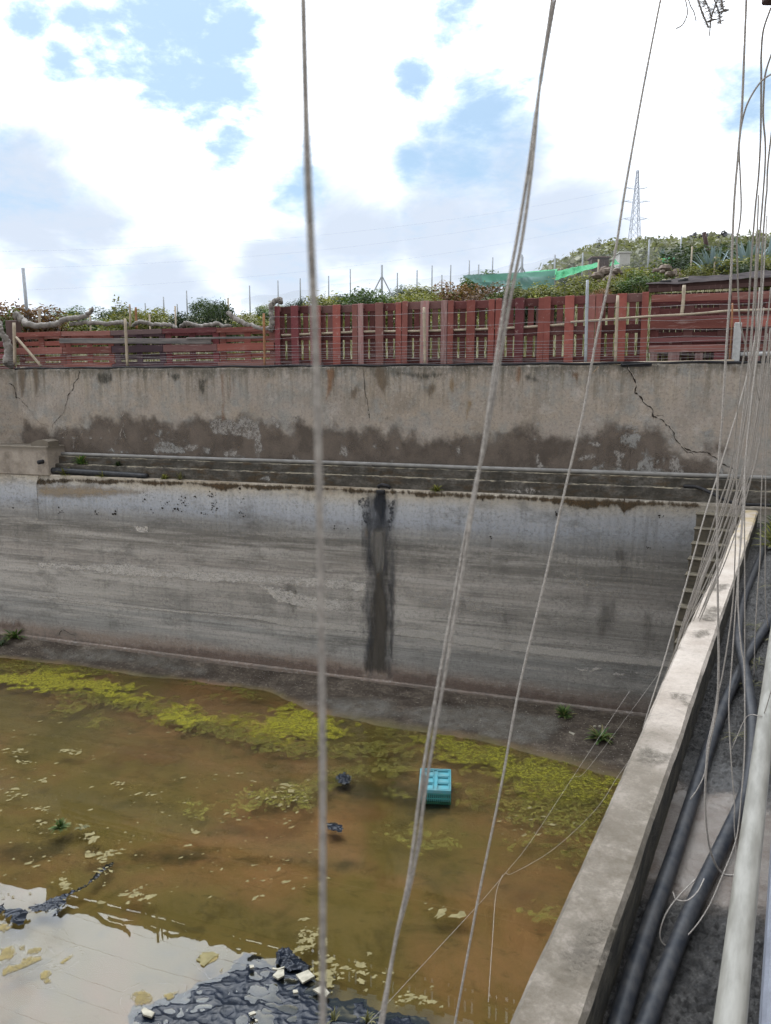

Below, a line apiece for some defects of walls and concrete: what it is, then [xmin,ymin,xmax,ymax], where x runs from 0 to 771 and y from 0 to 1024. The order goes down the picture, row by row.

crack [9,371,80,431]
leakage [22,414,722,474]
crack [627,367,733,469]
leakage [31,493,670,705]